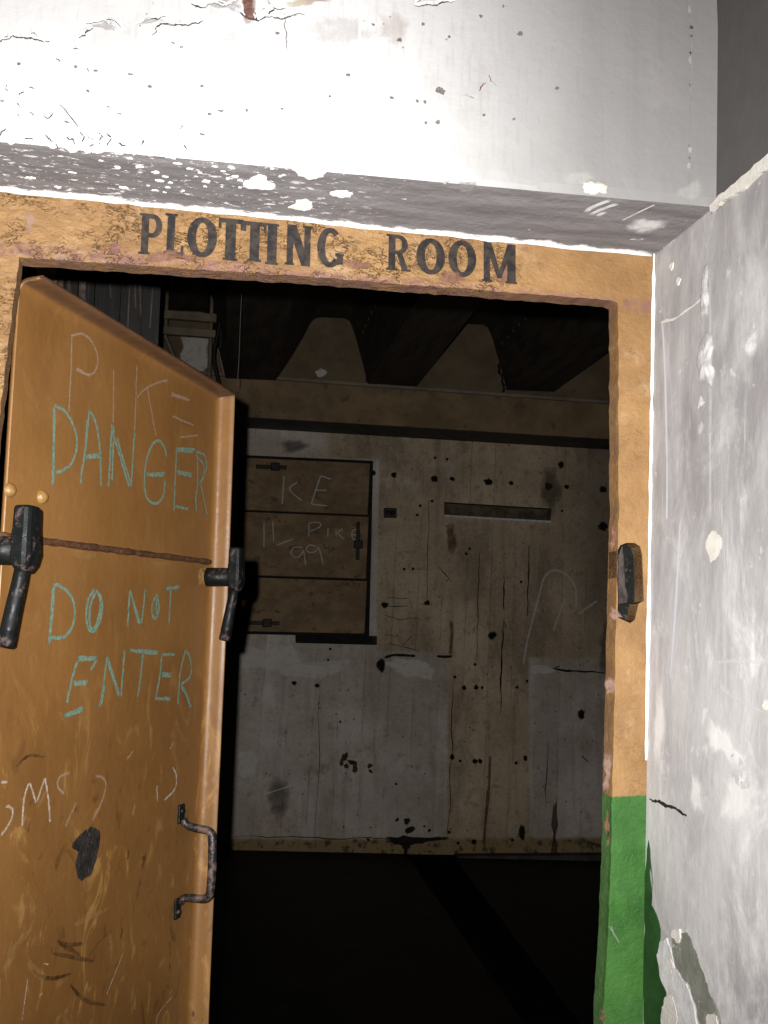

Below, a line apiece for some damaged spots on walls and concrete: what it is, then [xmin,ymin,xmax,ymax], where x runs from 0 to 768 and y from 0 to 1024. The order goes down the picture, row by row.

crack [77,0,305,48]
crack [0,30,50,43]
peeling [0,83,330,193]
peeling [330,190,353,198]
peeling [288,199,313,211]
crack [650,799,687,816]
peeling [643,840,722,1024]